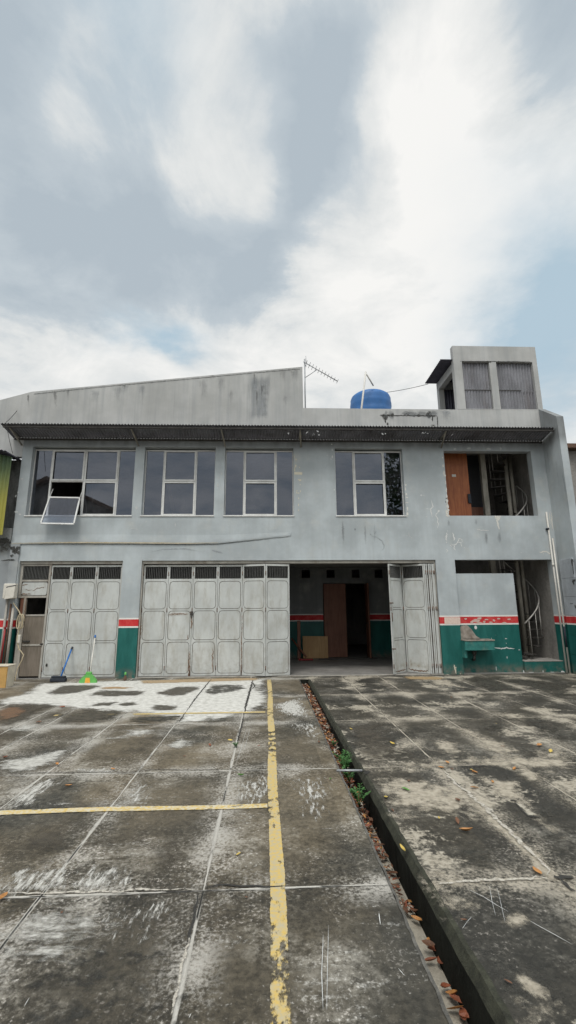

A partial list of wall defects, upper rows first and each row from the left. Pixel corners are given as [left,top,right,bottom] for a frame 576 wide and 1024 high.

peeling [444,617,511,629]